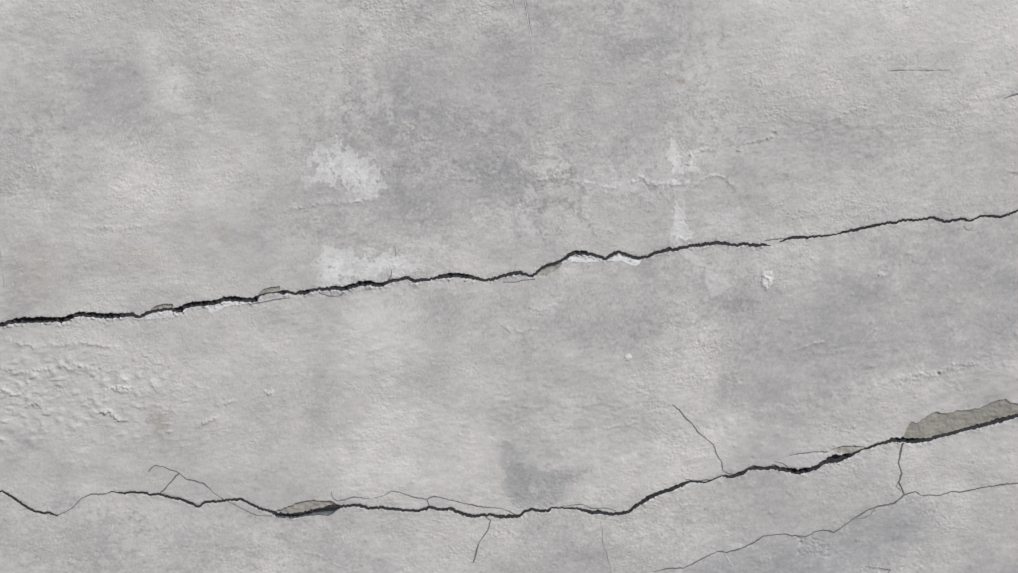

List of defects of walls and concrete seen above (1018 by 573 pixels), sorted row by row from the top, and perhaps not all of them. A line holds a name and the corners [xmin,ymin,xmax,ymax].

crack [0,209,1018,327]
spalling [904,399,1018,438]
crack [0,404,1018,573]